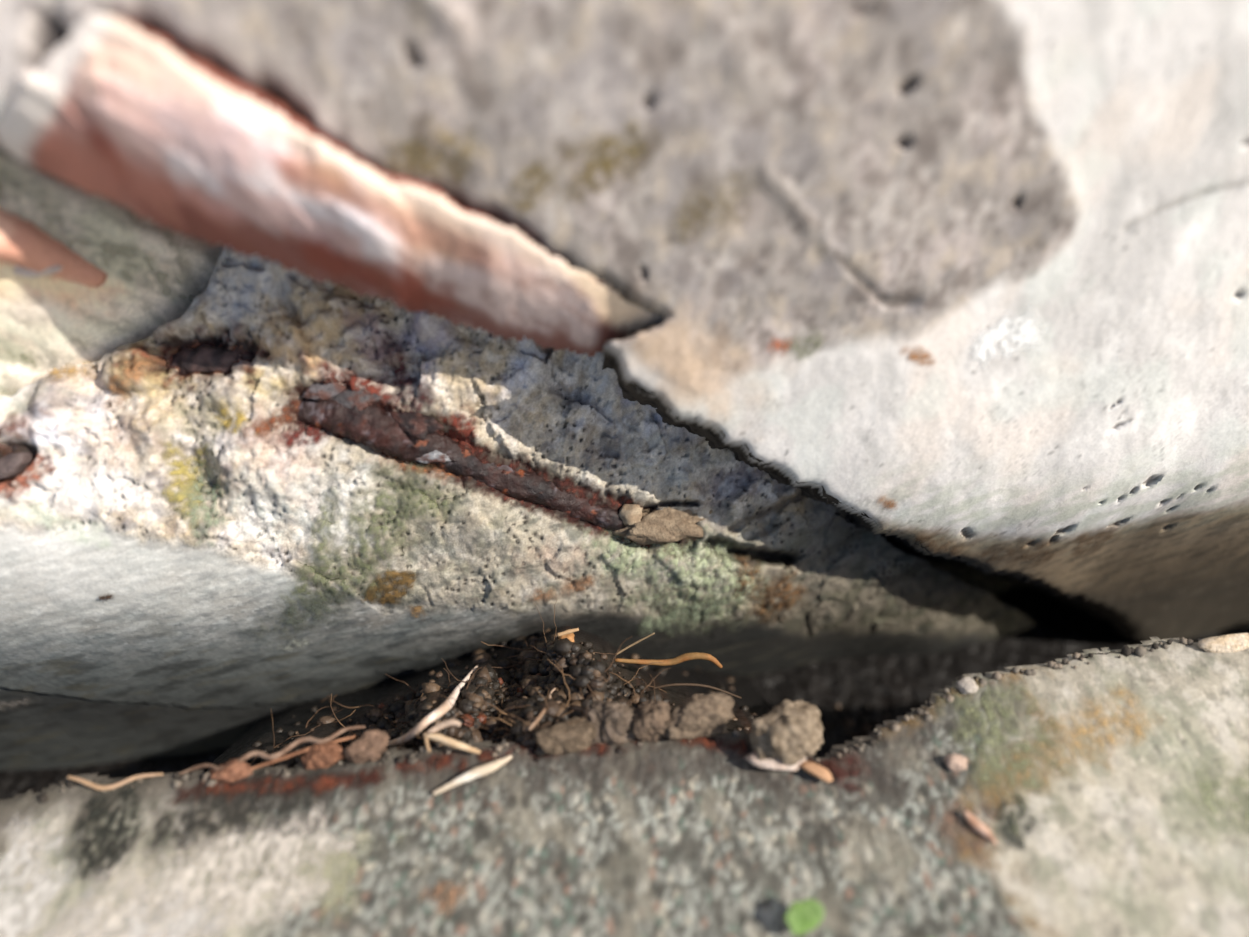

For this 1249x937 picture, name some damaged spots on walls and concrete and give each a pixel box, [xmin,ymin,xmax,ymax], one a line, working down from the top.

crack [1121,180,1249,234]
spalling [0,0,1034,640]
rust [109,330,269,395]
rust [319,342,433,413]
rust [252,385,344,446]
spalling [1109,400,1131,431]
rust [0,455,55,497]
rust [381,452,695,559]
rust [436,415,648,509]
crack [602,343,1142,644]
spalling [1025,524,1075,547]
spalling [1098,474,1164,505]